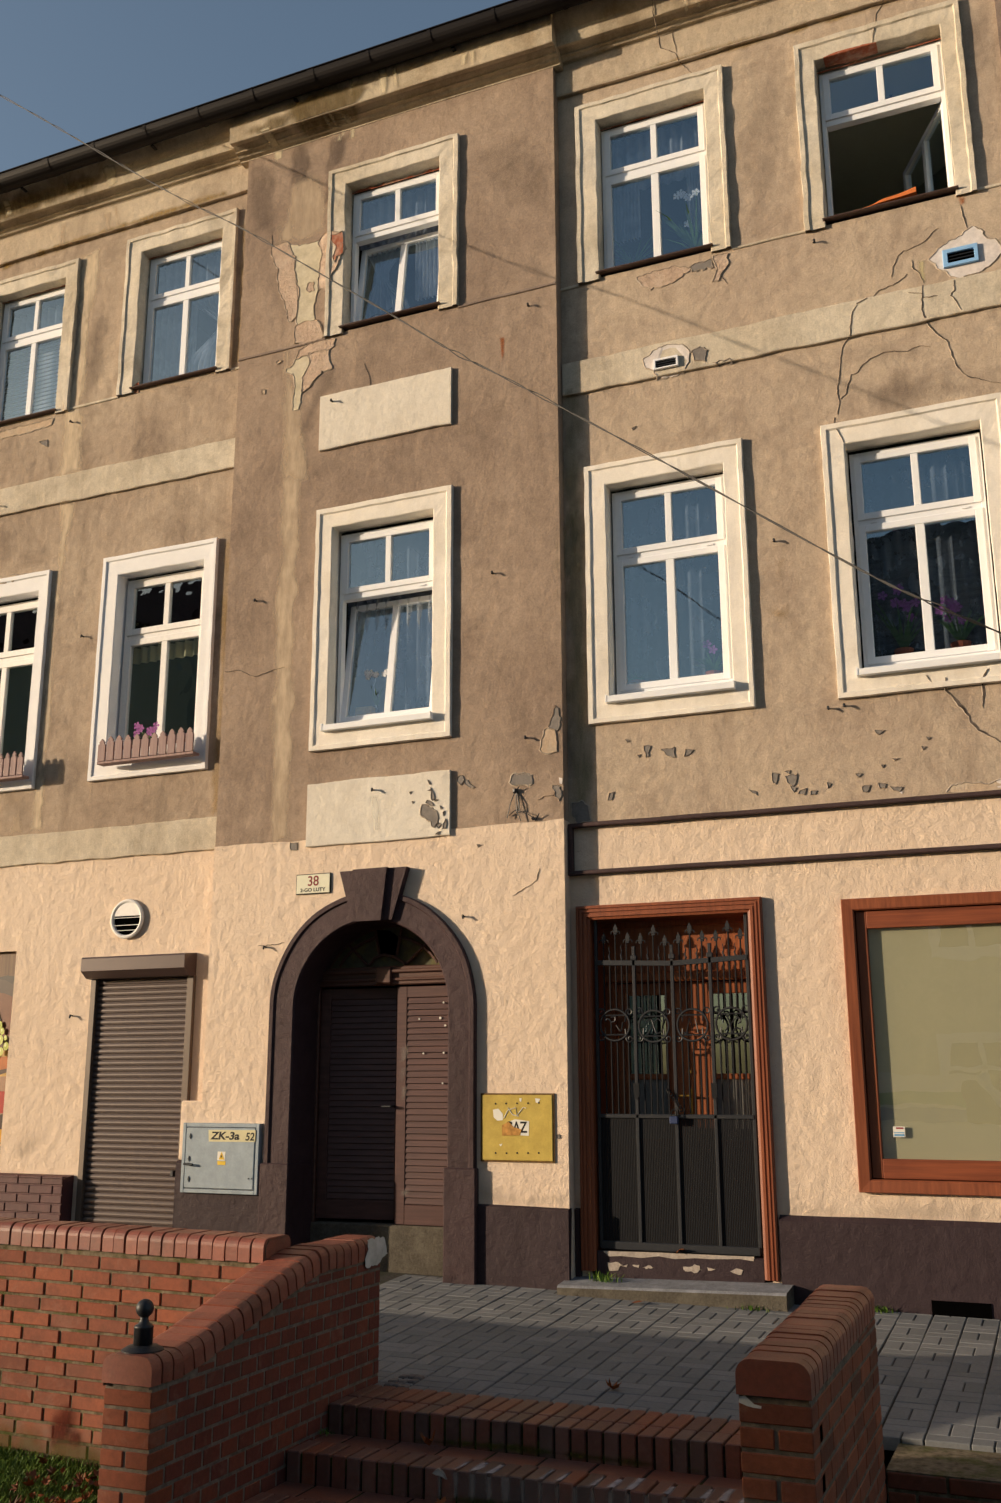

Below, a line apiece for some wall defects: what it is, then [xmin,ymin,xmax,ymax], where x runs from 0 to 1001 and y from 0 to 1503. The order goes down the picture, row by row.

flaking render [271,231,347,411]
crack [834,207,999,443]
crack [926,668,1001,743]
peeling [409,780,447,835]
peeling [771,770,831,795]
peeling [855,758,903,794]
spalling [946,779,1001,793]